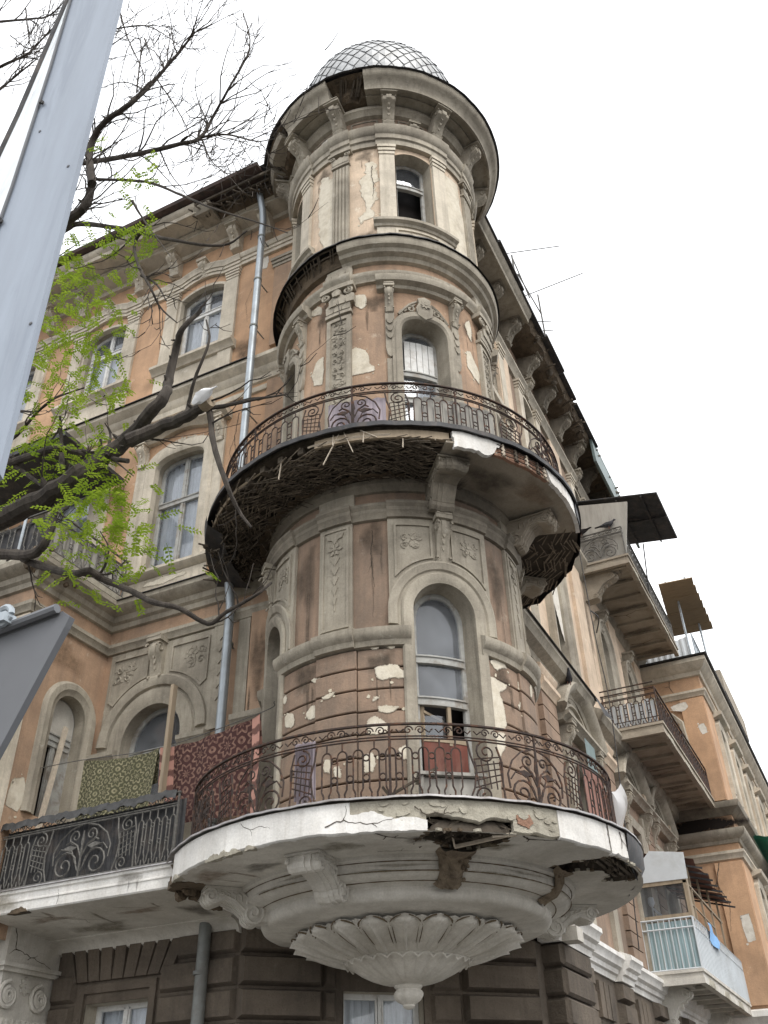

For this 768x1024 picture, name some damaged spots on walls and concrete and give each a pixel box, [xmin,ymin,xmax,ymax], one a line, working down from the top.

peeling [352,347,379,376]
peeling [465,321,480,385]
peeling [371,664,404,684]
peeling [283,689,336,728]
peeling [366,695,405,735]
peeling [490,659,534,759]
peeling [323,759,345,778]
peeling [364,752,378,773]
crack [325,806,460,852]
spalling [413,799,557,852]
spalling [548,856,642,882]
crack [12,890,99,970]